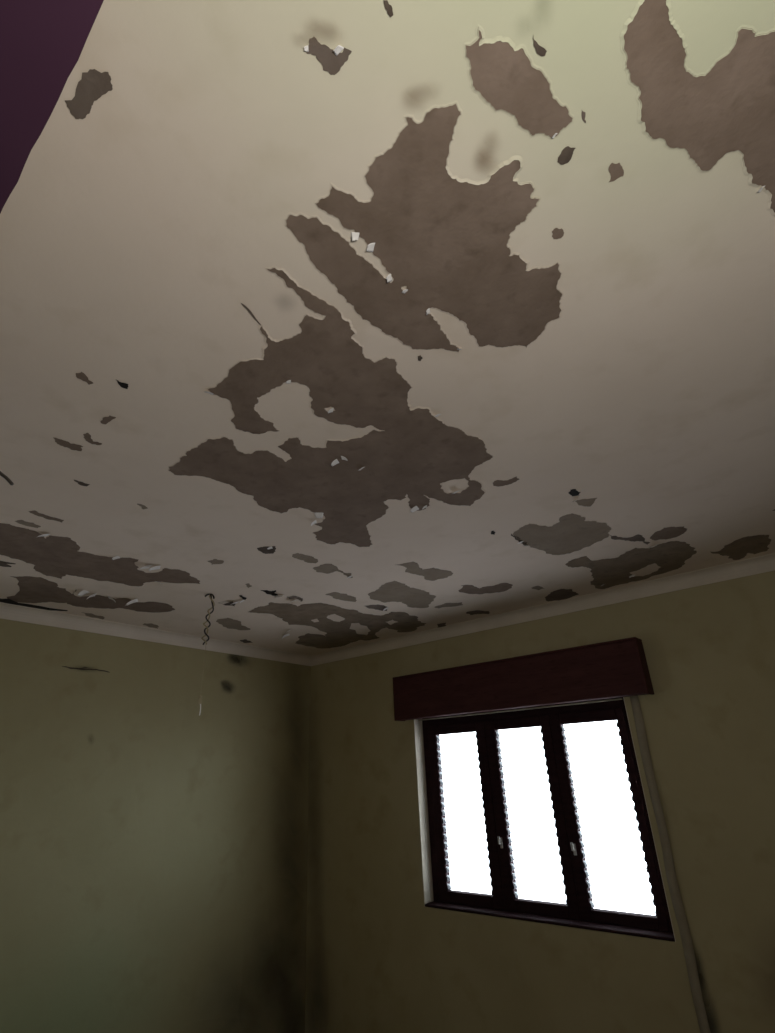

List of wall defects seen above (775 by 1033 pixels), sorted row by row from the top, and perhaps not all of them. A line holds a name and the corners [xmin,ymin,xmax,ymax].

peeling [304,37,352,75]
peeling [463,24,586,165]
peeling [619,0,775,216]
peeling [167,100,564,547]
crack [0,560,16,568]
crack [0,599,68,611]
peeling [0,510,201,629]
peeling [216,562,513,649]
peeling [511,489,697,589]
peeling [711,535,771,560]